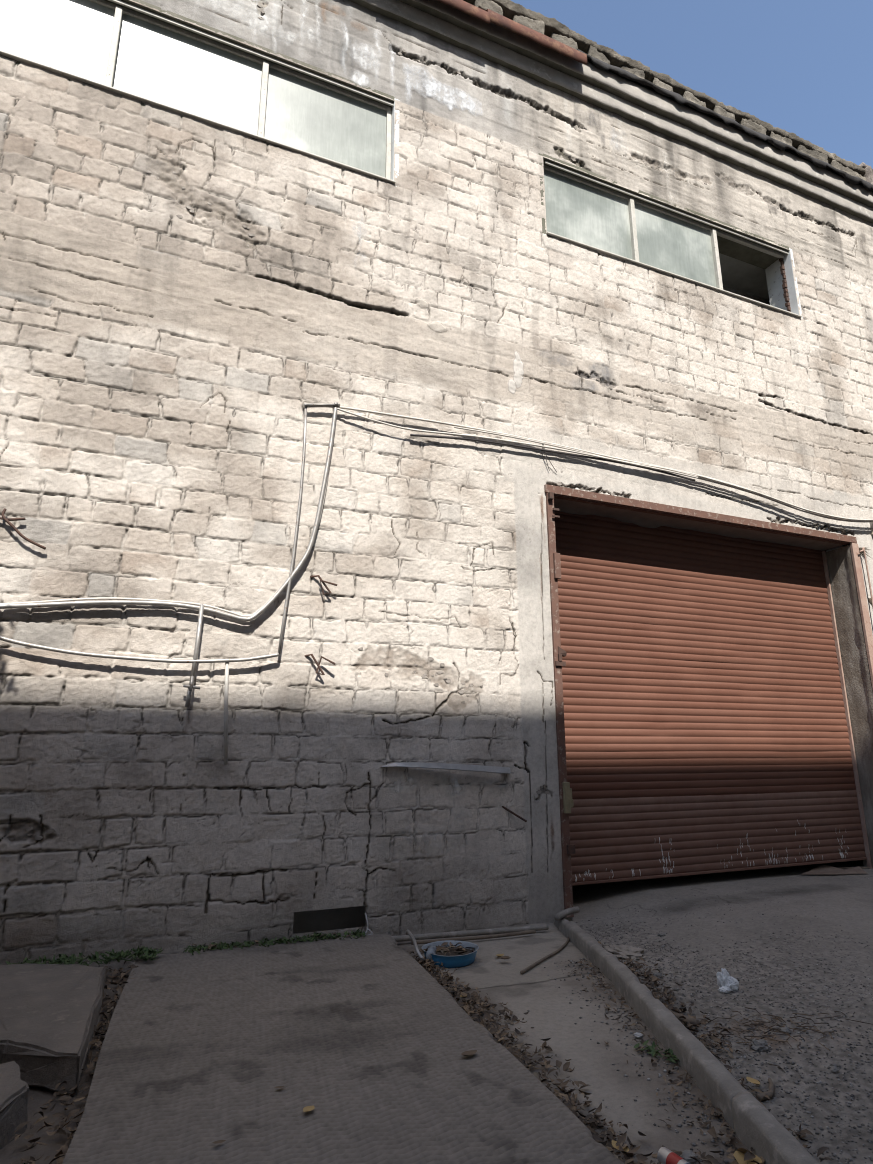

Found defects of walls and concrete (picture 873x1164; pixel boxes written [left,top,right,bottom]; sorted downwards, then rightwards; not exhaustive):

crack [214,300,736,421]
crack [0,815,43,848]